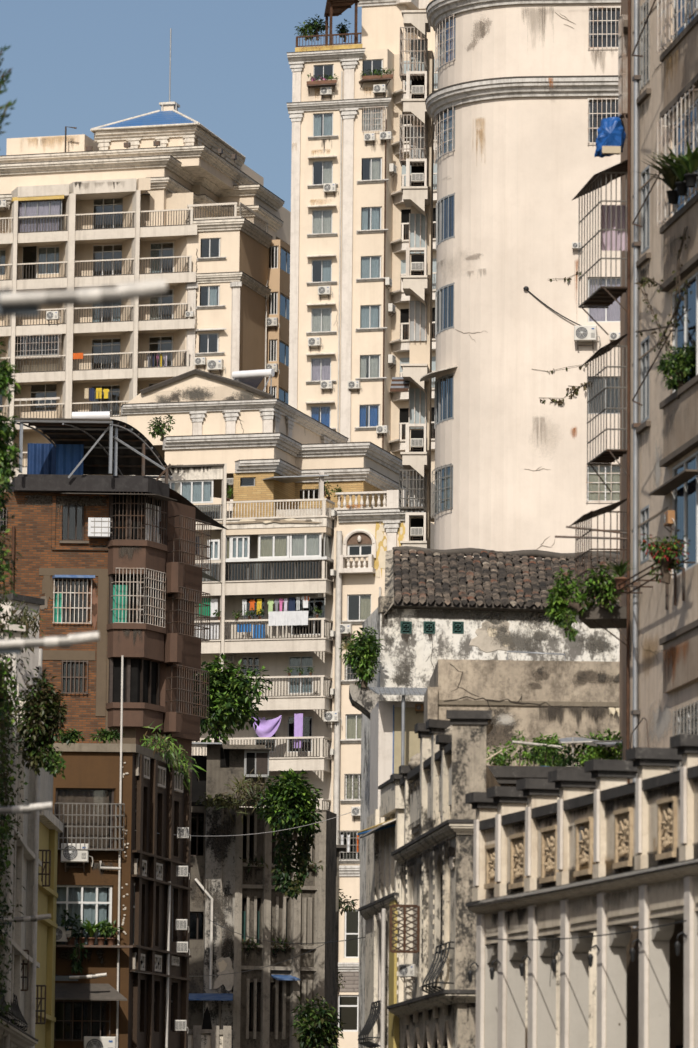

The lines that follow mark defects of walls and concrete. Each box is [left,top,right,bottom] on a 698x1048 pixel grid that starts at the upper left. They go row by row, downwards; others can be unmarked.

leakage [382,612,412,645]
leakage [411,609,554,652]
leakage [578,633,613,653]
leakage [393,659,413,685]
crack [427,640,562,709]
leakage [529,667,550,689]
leakage [575,671,619,684]
leakage [211,815,236,866]
leakage [190,876,260,960]